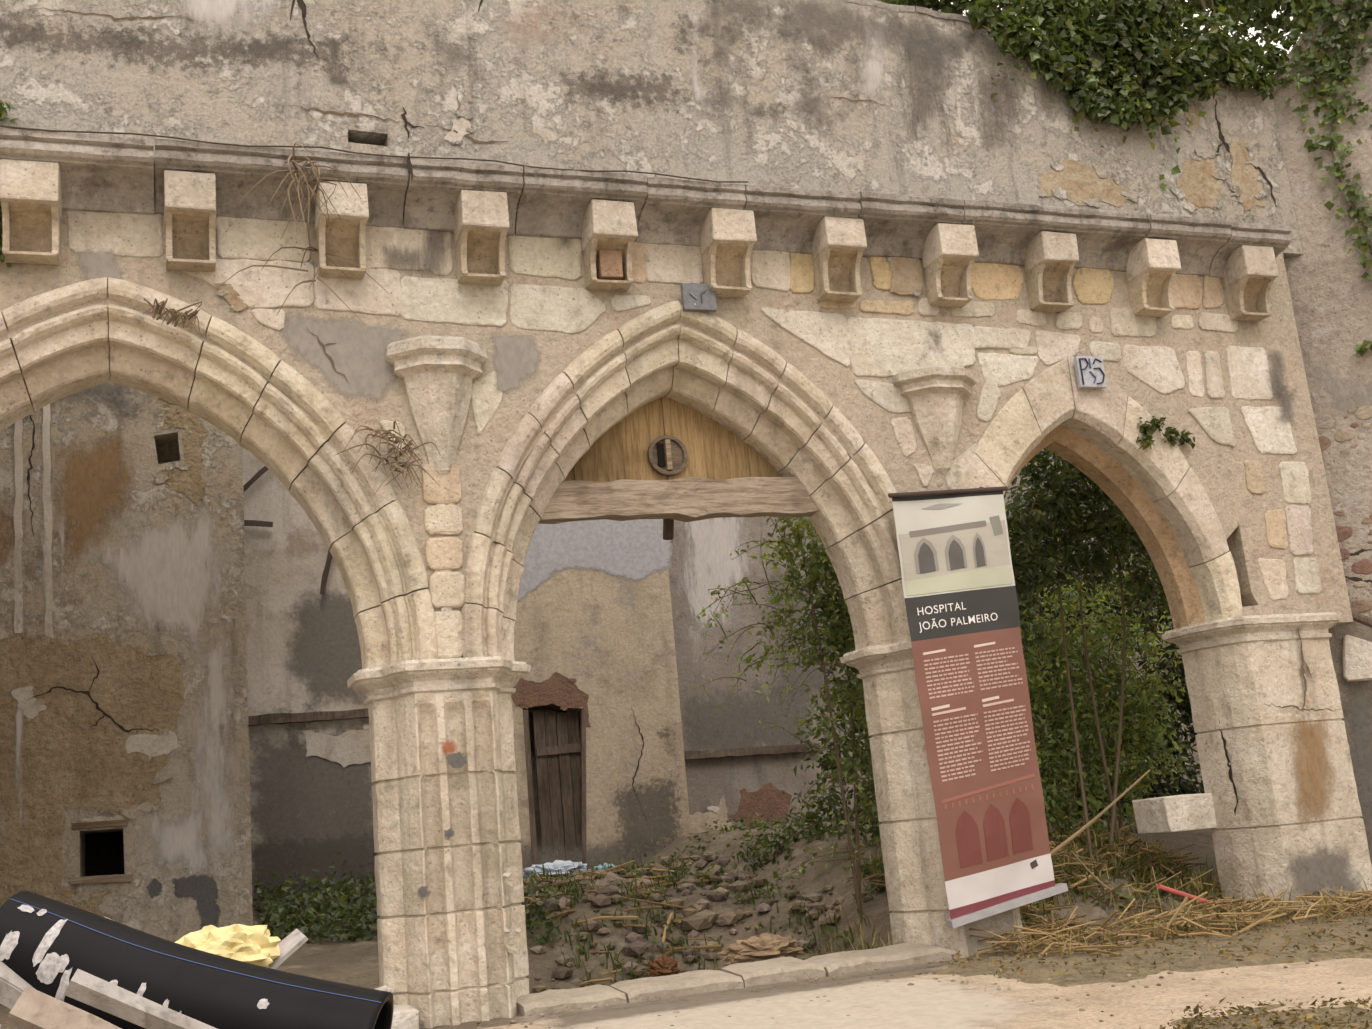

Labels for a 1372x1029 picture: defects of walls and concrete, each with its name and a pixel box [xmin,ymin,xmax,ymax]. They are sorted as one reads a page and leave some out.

water stain [0,0,349,85]
crack [290,0,318,58]
water stain [561,0,971,120]
flaking render [1039,159,1140,208]
flaking render [1170,137,1268,212]
crack [1214,99,1277,207]
water stain [42,439,222,640]
water stain [288,593,362,705]
crack [1265,629,1341,711]
flaking render [0,624,185,920]
water stain [151,645,378,911]
crack [1219,721,1238,815]